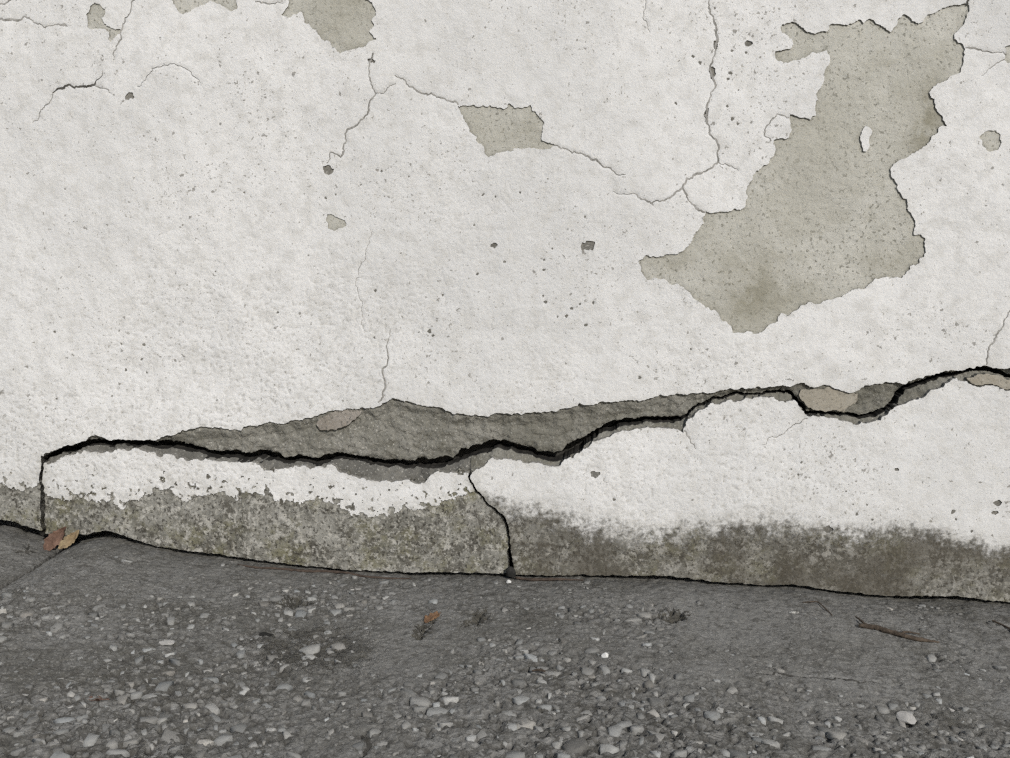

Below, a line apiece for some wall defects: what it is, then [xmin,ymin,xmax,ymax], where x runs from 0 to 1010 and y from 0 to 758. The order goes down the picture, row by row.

crack [0,0,67,28]
crack [33,0,134,122]
peeling [173,0,238,14]
peeling [282,0,376,54]
crack [327,53,459,163]
peeling [458,104,554,157]
crack [553,0,738,213]
crack [764,114,789,141]
peeling [638,4,969,334]
crack [355,229,372,328]
crack [25,311,1010,568]
leakage [485,496,1010,602]